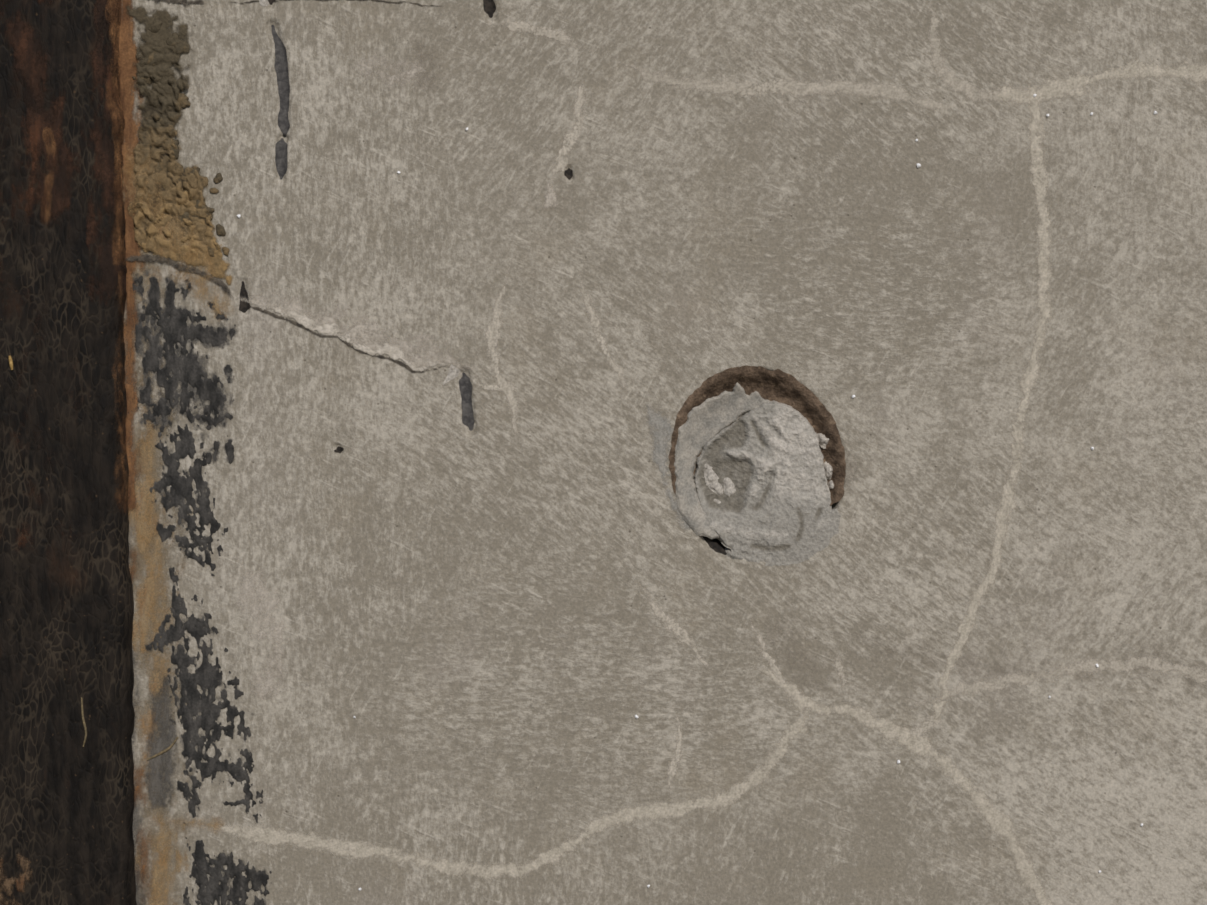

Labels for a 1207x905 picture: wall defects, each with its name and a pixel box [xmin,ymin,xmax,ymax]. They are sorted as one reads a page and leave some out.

crack [544,85,585,208]
crack [625,64,949,114]
rust [5,0,225,691]
peeling [133,271,250,576]
crack [125,254,518,433]
crack [636,585,708,667]
peeling [703,464,736,504]
spalling [703,536,744,559]
peeling [817,433,834,489]
crack [910,0,1207,736]
peeling [145,567,272,905]
crack [211,625,1052,905]